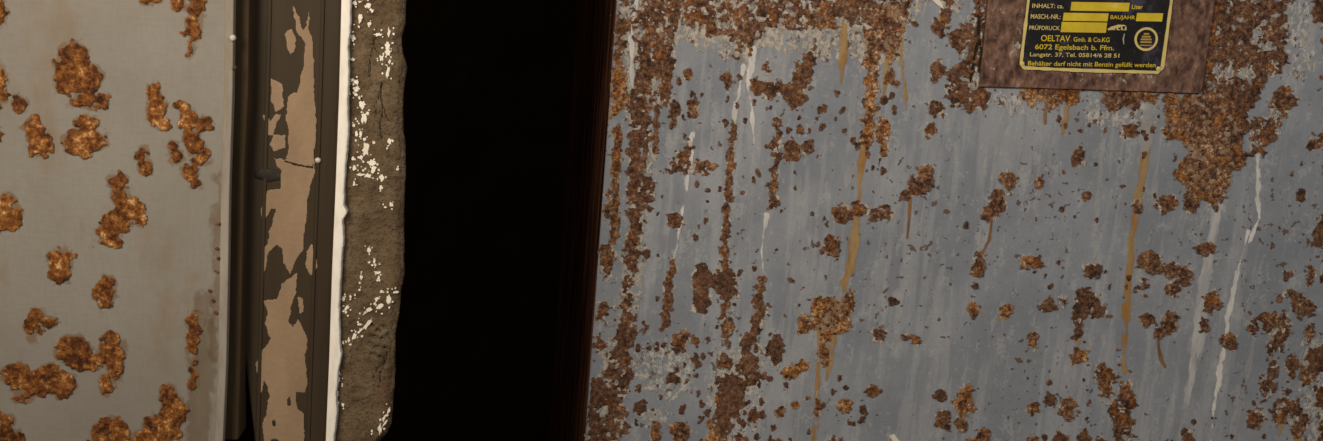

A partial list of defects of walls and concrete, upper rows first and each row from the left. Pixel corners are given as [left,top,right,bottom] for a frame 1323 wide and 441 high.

rust [139,0,206,57]
rust [0,38,111,159]
rust [146,82,214,189]
rust [46,246,77,285]
rust [92,275,115,309]
rust [95,148,152,249]
peeling [255,6,317,441]
rust [586,0,991,441]
rust [963,169,1045,321]
rust [1019,0,1323,441]
rust [0,308,125,404]
rust [86,310,202,441]